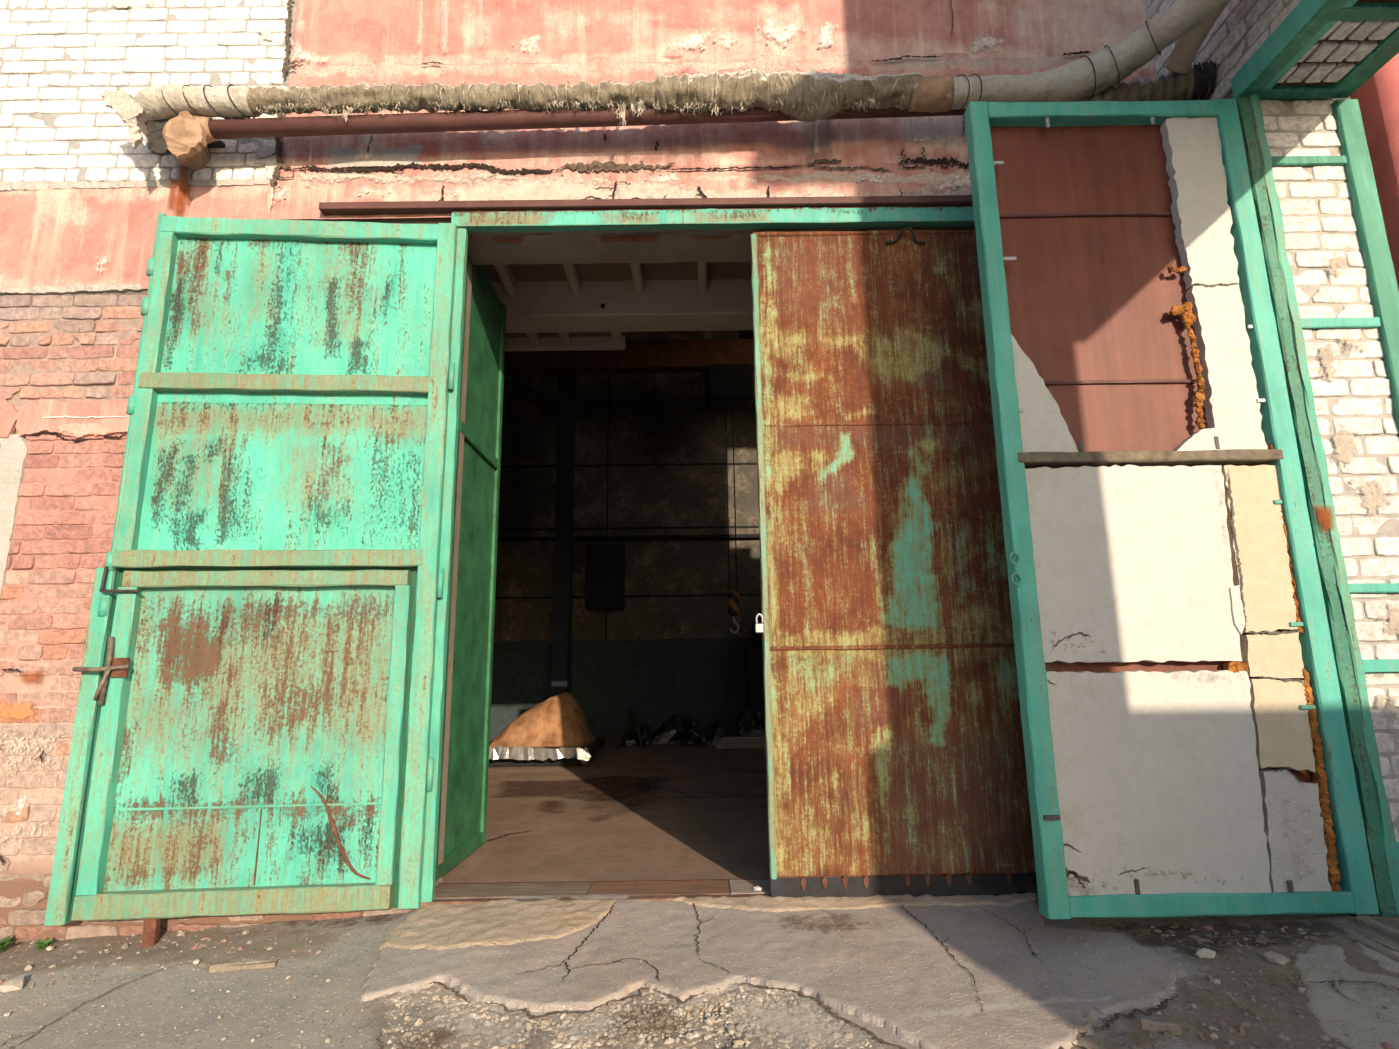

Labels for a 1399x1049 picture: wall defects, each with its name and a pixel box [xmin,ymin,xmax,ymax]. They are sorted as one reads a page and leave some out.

crack [257,0,969,201]
rust [168,164,190,215]
crack [516,901,660,982]
crack [693,903,729,972]
crack [2,961,204,1049]